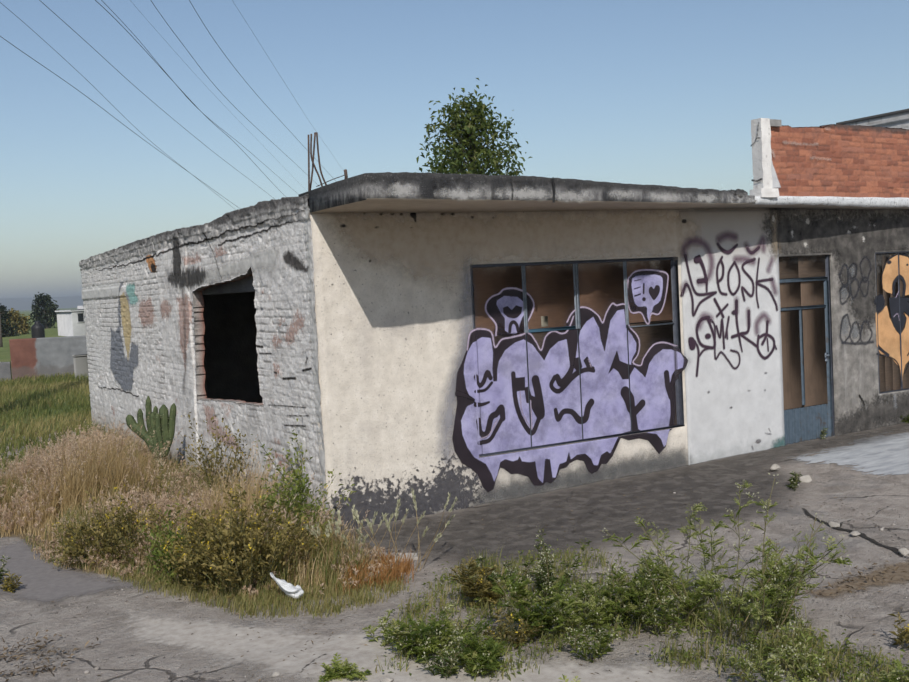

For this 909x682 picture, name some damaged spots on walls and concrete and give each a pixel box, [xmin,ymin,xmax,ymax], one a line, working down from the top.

damp [420,176,451,198]
damp [517,181,550,200]
damp [320,269,687,531]